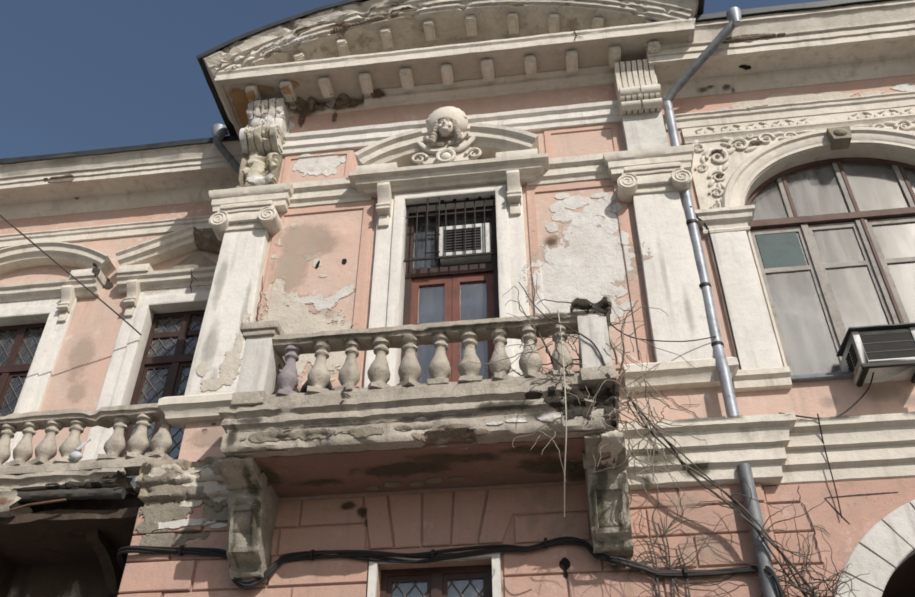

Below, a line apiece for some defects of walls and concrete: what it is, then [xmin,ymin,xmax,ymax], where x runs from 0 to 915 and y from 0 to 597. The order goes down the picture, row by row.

spalling [242,93,364,186]
peeling [519,192,653,332]
peeling [242,276,359,334]
peeling [196,333,244,393]
peeling [296,351,347,385]
peeling [240,426,384,443]
water stain [367,454,497,477]
spalling [395,373,625,469]
water stain [509,446,586,479]
spalling [9,464,229,555]